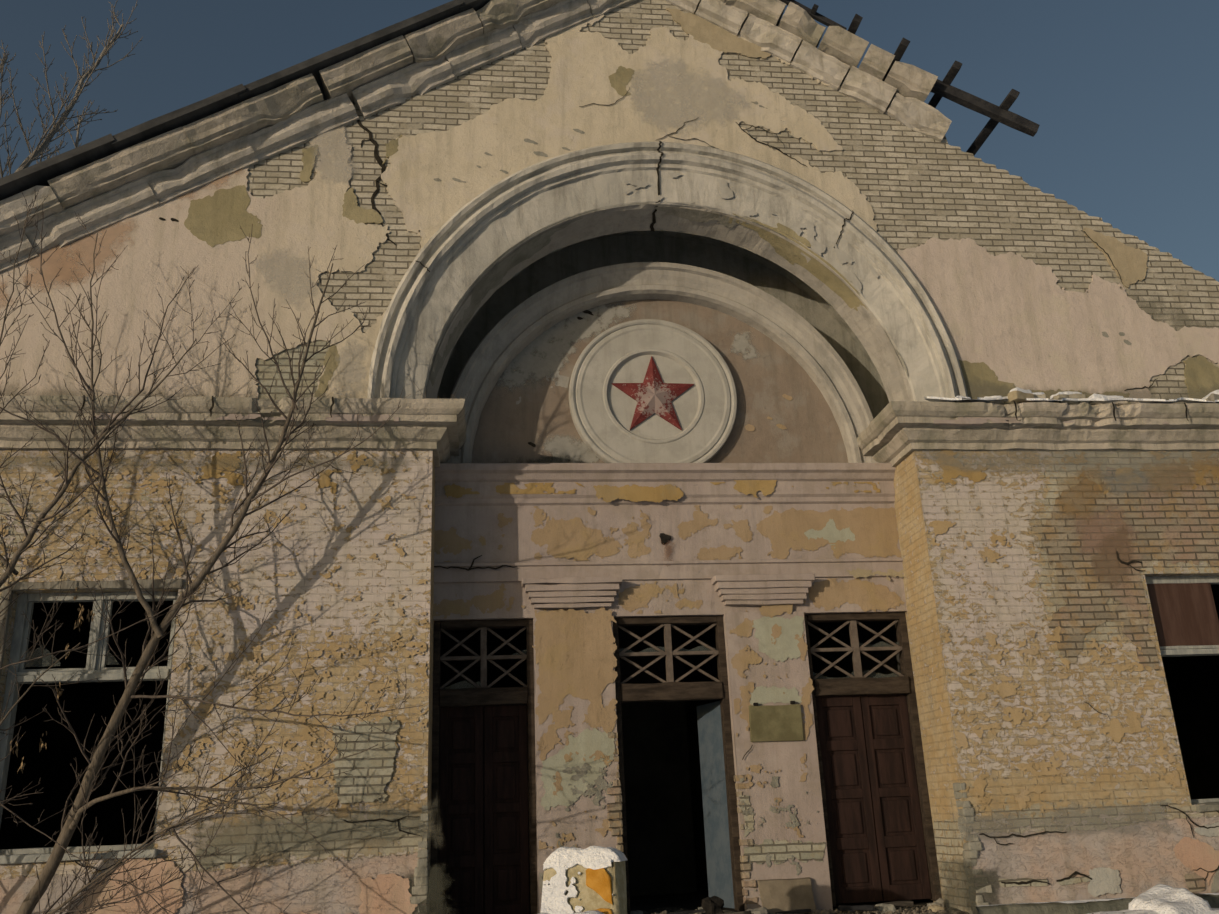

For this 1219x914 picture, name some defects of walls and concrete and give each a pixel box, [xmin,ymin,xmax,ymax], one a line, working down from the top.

flaking render [159,142,321,247]
crack [357,120,430,272]
flaking render [317,40,552,333]
crack [650,117,715,231]
crack [736,122,807,167]
flaking render [580,0,1219,331]
flaking render [927,450,1219,671]
peeling [168,554,703,853]
peeling [729,578,905,794]
crack [979,831,1067,845]
crack [1001,871,1092,885]
crack [1160,805,1219,838]